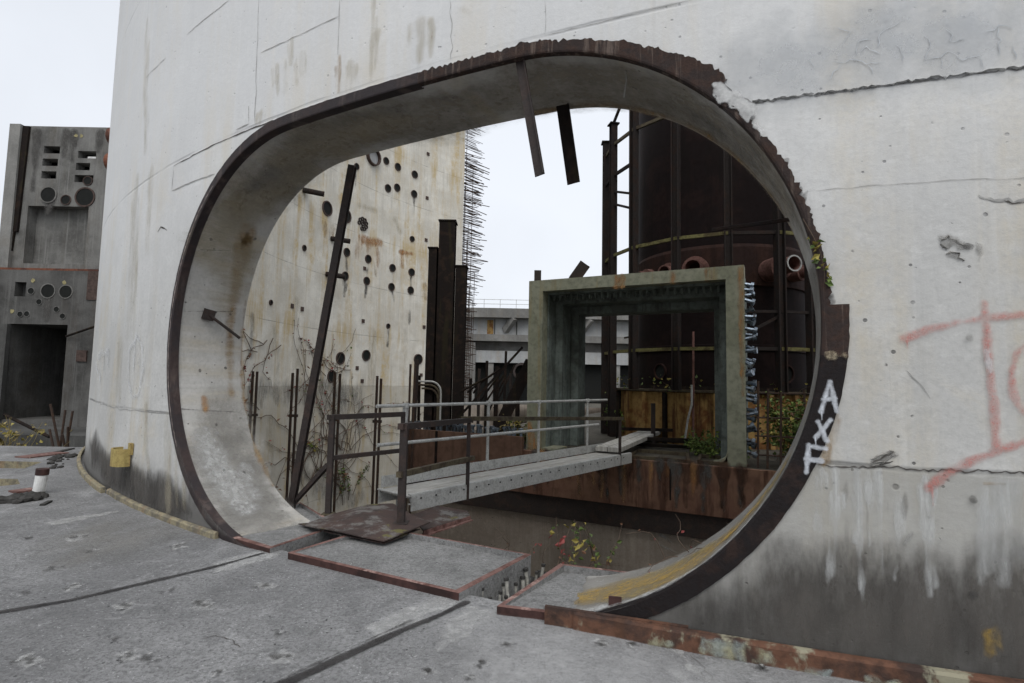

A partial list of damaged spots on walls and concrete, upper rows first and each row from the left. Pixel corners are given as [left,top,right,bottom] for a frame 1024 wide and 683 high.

crack [723,65,1024,103]
peeling [712,82,763,134]
crack [817,177,1024,204]
spalling [940,235,982,261]
leakage [91,436,187,516]
rust [598,457,748,511]
crack [820,461,1024,474]